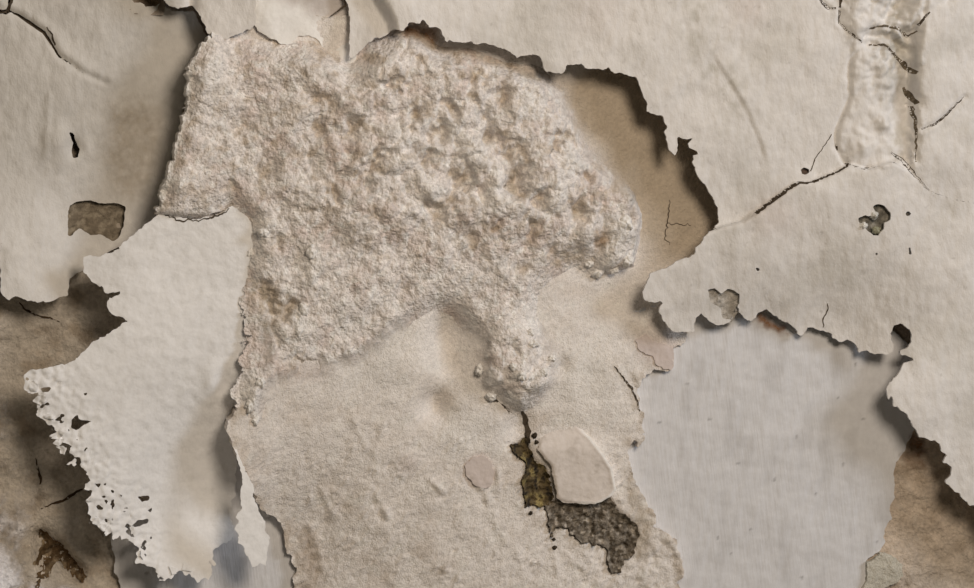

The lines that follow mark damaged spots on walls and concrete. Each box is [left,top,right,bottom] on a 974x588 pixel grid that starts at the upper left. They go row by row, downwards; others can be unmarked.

crack [0,0,70,64]
spalling [230,0,356,64]
crack [820,0,862,43]
crack [754,134,930,214]
spalling [224,20,974,588]
peeling [29,380,48,405]
peeling [49,430,67,455]
peeling [92,518,113,536]
damp [510,432,640,573]